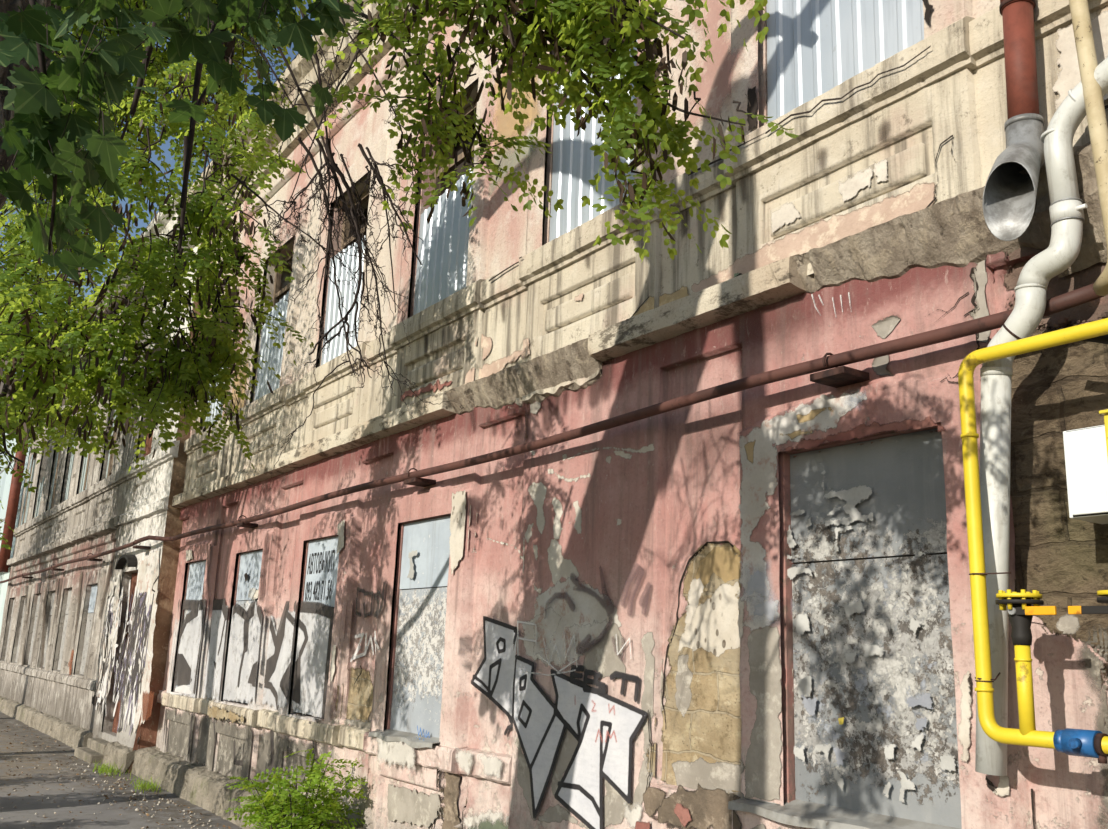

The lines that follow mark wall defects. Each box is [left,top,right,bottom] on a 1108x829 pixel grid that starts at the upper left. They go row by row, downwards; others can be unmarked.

spalling [634,182,935,316]
peeling [400,334,530,402]
damp [502,402,528,438]
damp [579,360,611,404]
spalling [872,355,893,376]
spalling [872,315,901,339]
peeling [449,490,477,575]
peeling [522,469,626,679]
spalling [603,389,946,829]
spalling [330,645,373,729]
spalling [437,770,467,829]
peeling [515,737,589,829]